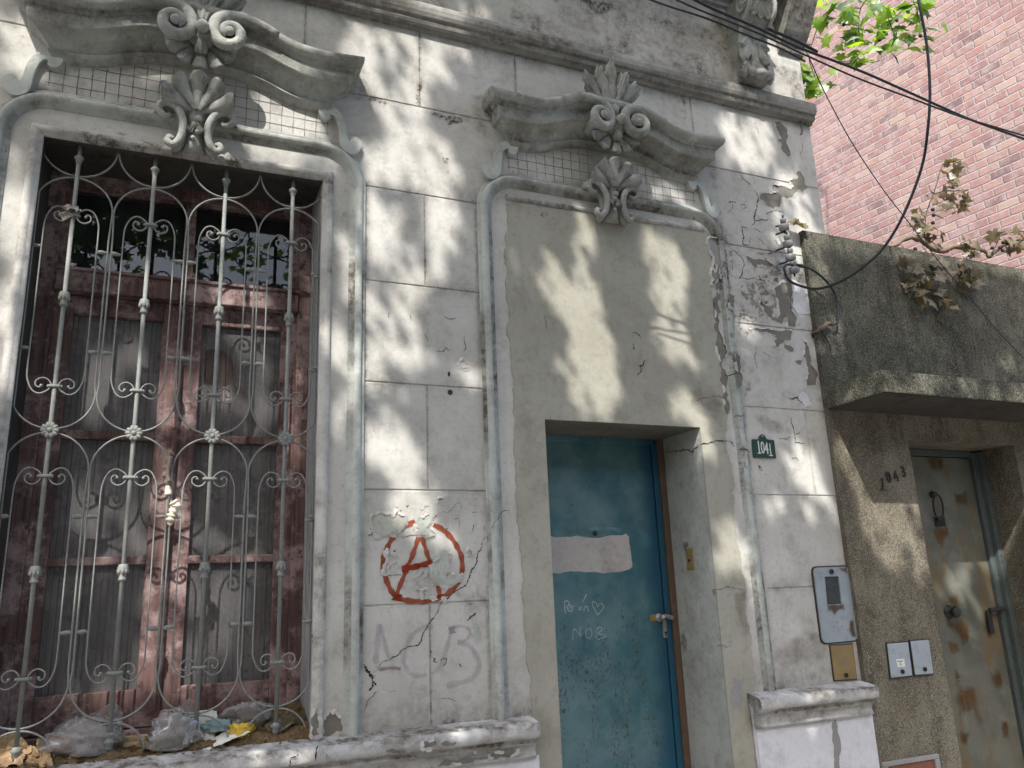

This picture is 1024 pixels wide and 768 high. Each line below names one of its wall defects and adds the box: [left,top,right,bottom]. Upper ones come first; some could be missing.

peeling [774,121,804,159]
peeling [759,171,807,210]
crack [720,175,778,280]
peeling [706,236,819,414]
crack [665,440,749,455]
peeling [369,508,436,576]
peeling [412,550,464,603]
crack [364,502,508,712]
peeling [309,708,343,740]
peeling [419,736,457,752]
peeling [438,748,520,766]